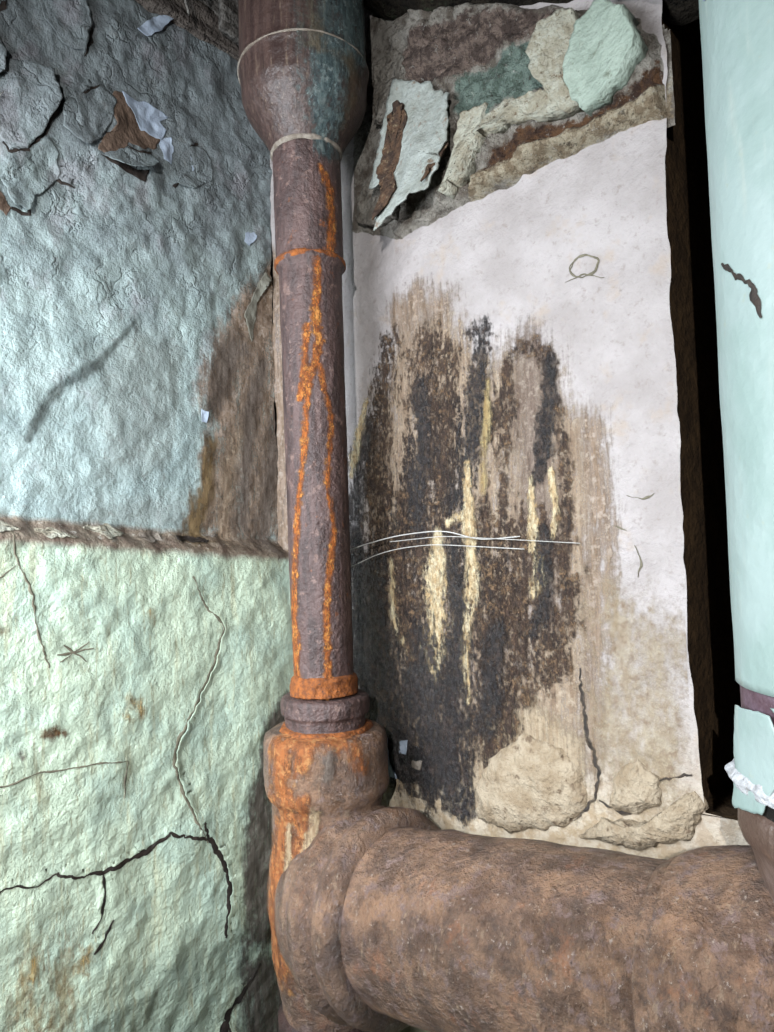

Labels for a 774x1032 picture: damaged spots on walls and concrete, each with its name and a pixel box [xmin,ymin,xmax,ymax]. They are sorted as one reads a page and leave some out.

crack [2,0,100,153]
peeling [39,0,93,51]
peeling [0,39,174,216]
peeling [137,15,174,36]
spalling [352,0,675,240]
water stain [183,250,289,557]
crack [0,531,94,668]
water stain [347,281,686,827]
crack [0,571,241,955]
crack [573,668,632,821]
peeling [732,705,774,815]
crack [214,957,261,1032]